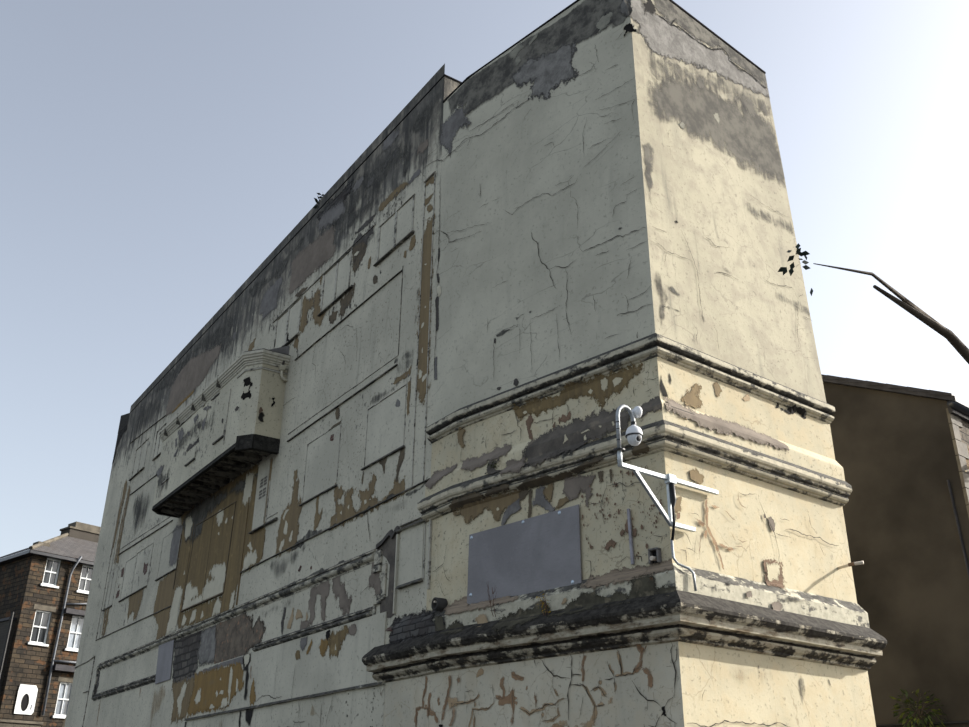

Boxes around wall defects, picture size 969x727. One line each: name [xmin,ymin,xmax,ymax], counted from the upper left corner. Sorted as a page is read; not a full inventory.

leakage [448,0,626,114]
crack [420,31,739,376]
leakage [643,144,653,191]
leakage [654,0,767,88]
leakage [649,50,785,184]
peeling [259,169,440,425]
leakage [112,403,155,464]
peeling [87,394,406,724]
spalling [385,361,789,647]
crack [414,640,788,727]